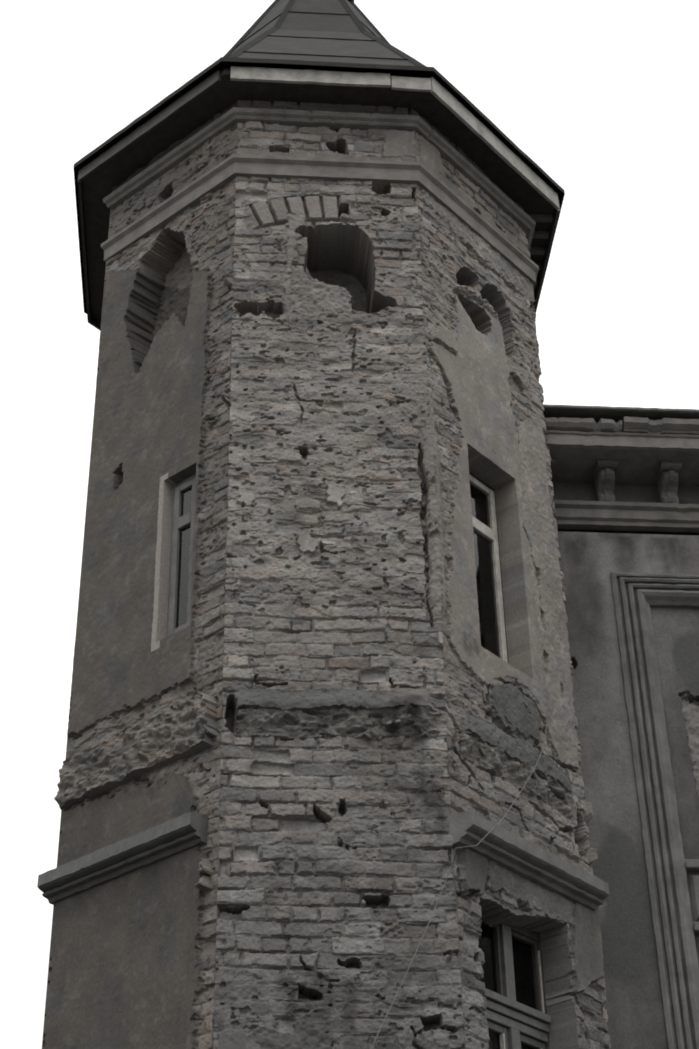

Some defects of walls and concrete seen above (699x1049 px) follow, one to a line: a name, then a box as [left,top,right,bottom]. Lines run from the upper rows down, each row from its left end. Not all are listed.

crack [427,341,452,402]
crack [418,447,432,627]
spalling [233,706,441,741]
spalling [680,697,699,794]